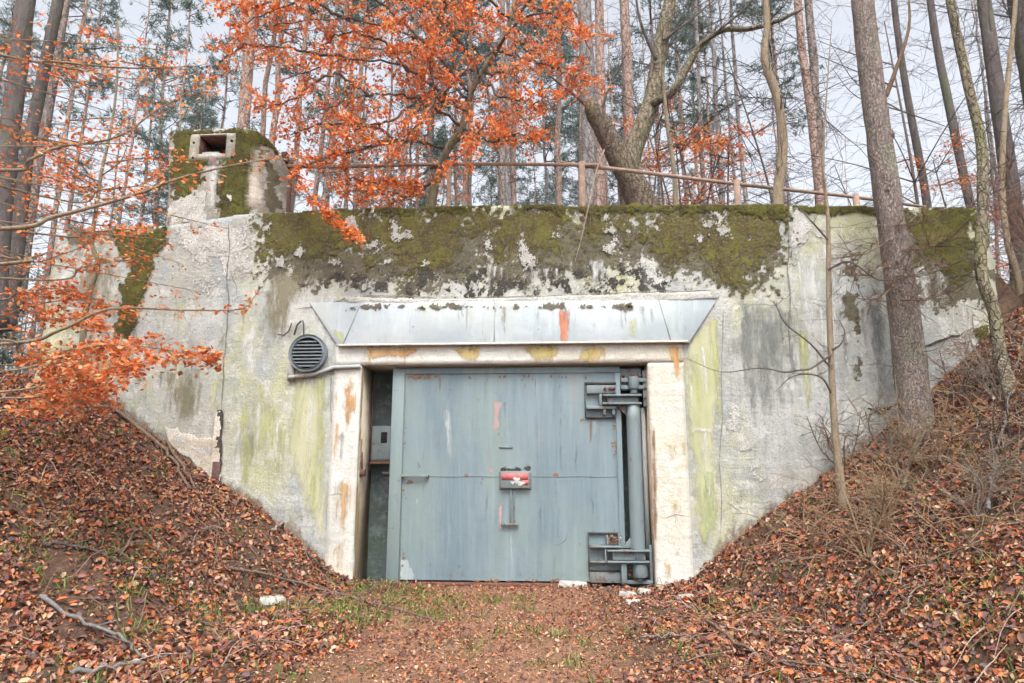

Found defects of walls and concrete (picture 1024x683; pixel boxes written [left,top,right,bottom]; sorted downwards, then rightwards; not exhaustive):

spalling [344,215,359,232]
spalling [359,213,414,269]
spalling [517,234,538,298]
spalling [601,213,631,262]
water stain [242,306,256,373]
rust [368,347,416,358]
rust [526,311,568,359]
rust [579,348,605,361]
water stain [742,244,850,404]
peeling [164,411,221,481]
water stain [236,385,285,482]
rust [334,372,364,579]